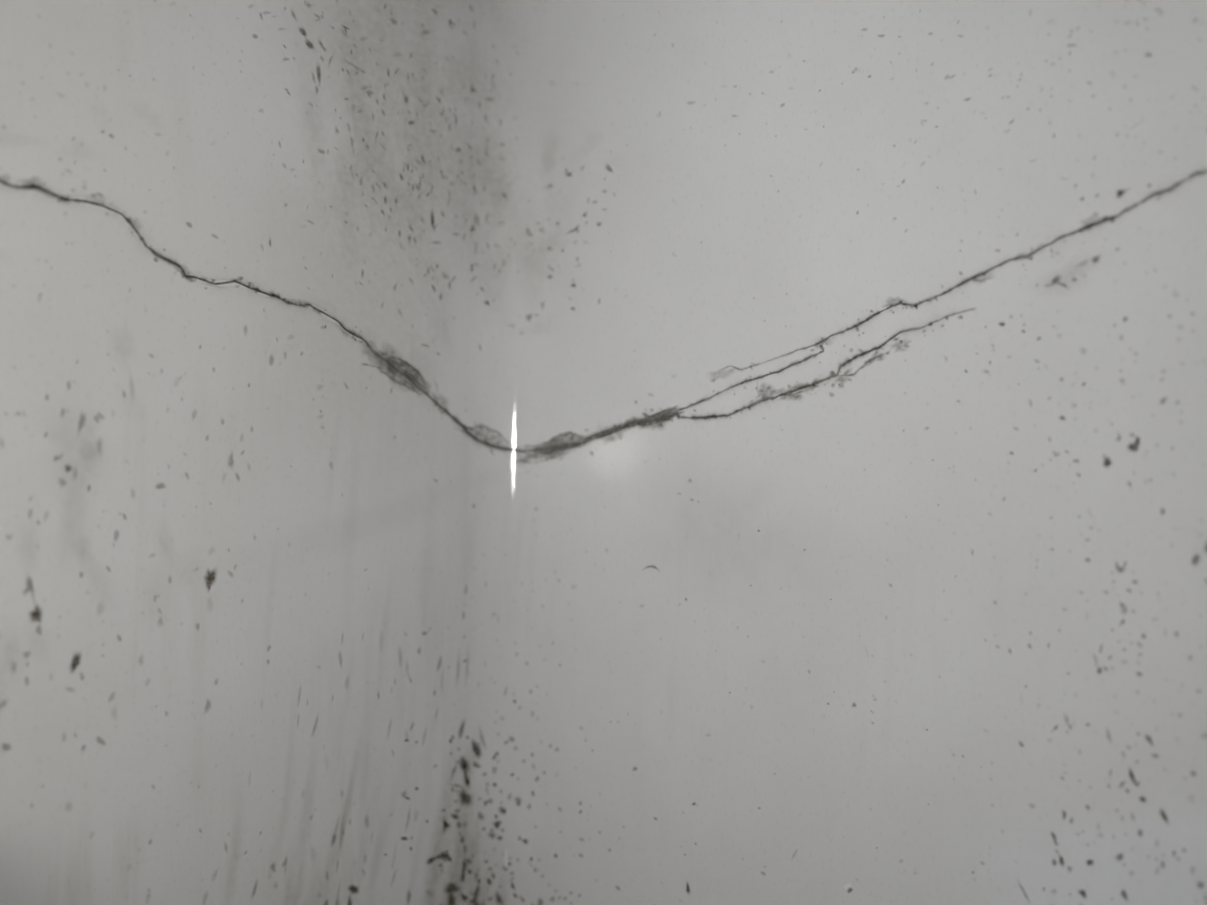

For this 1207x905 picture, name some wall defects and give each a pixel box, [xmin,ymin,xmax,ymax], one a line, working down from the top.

crack [0,165,1207,457]
mould [444,725,495,840]
mould [428,852,517,905]